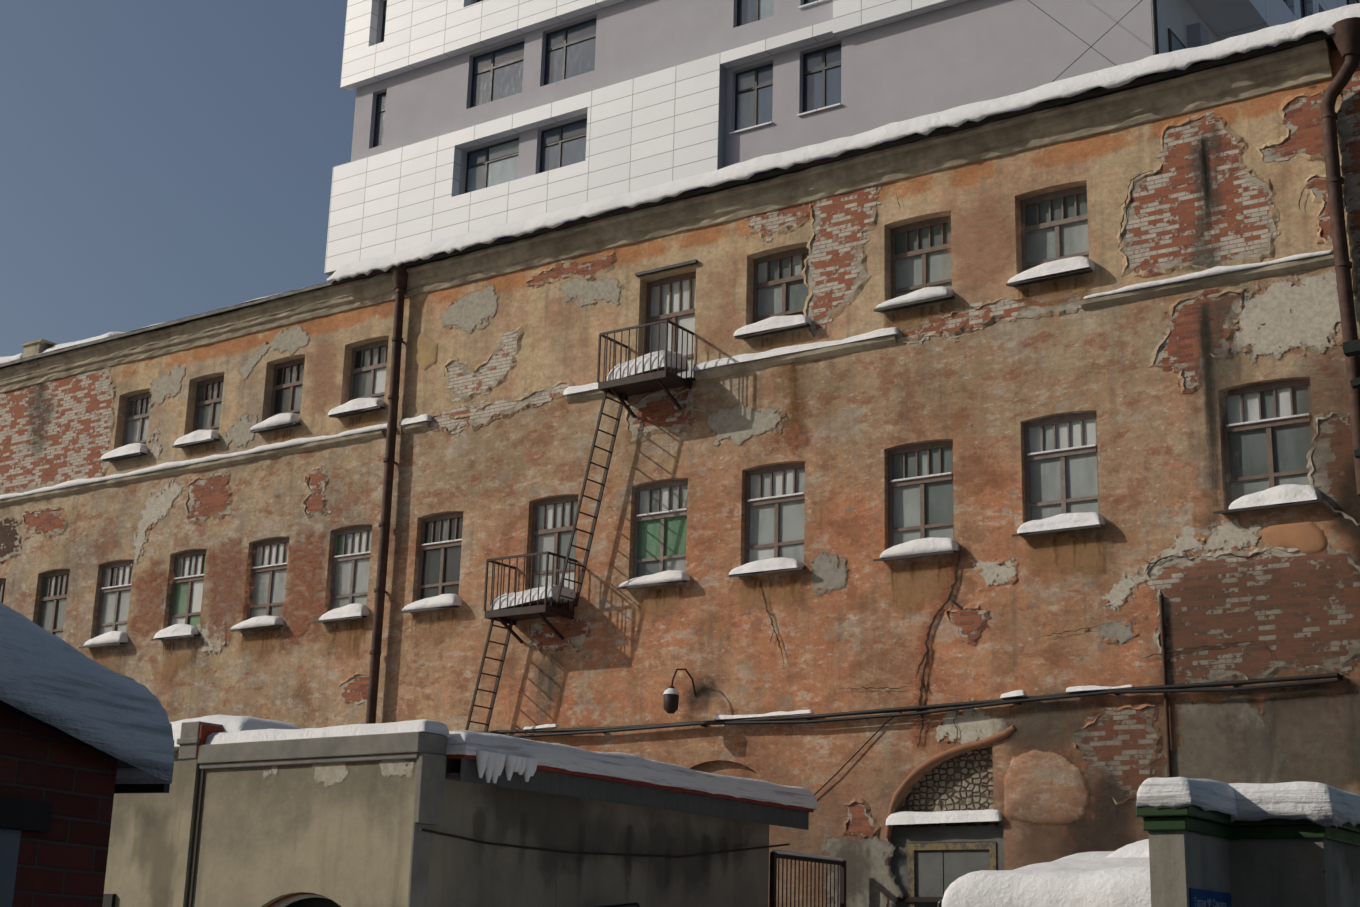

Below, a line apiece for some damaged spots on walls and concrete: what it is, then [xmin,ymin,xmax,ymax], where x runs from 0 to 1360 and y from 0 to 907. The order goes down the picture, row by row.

spalling [744,184,881,341]
spalling [888,289,1087,347]
spalling [1117,59,1360,394]
spalling [0,367,117,565]
spalling [130,468,235,567]
crack [760,581,784,666]
crack [840,548,964,746]
spalling [940,603,991,647]
spalling [1068,508,1360,805]